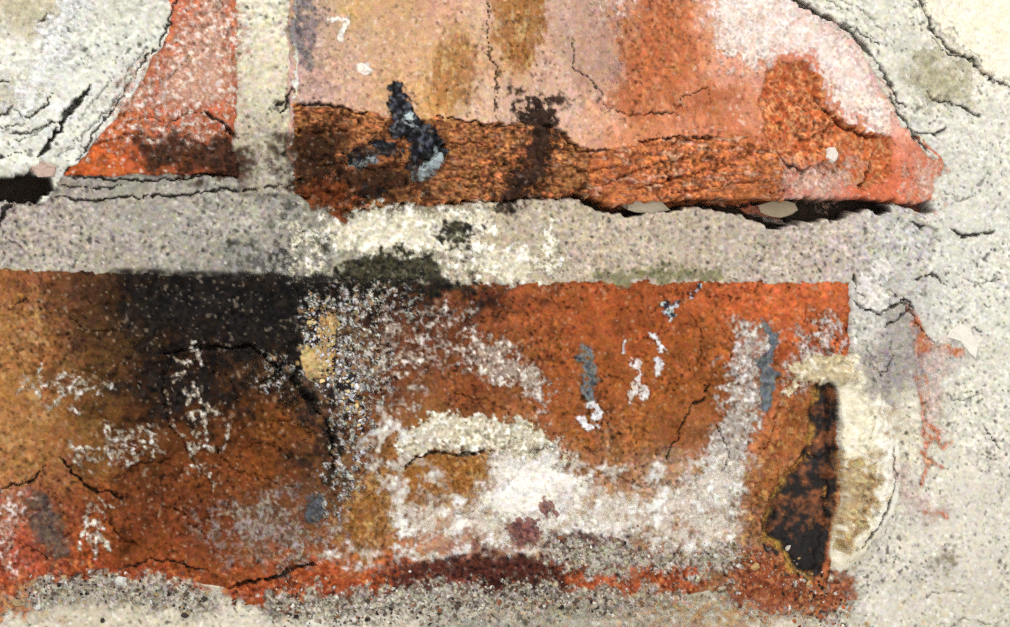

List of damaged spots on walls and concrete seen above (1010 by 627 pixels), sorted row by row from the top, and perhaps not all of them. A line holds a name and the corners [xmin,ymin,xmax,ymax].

damp [96,0,257,176]
spalling [289,59,893,214]
damp [775,157,864,207]
damp [903,159,950,215]
damp [0,85,779,577]
damp [781,305,964,435]
spalling [0,569,229,617]
spalling [255,537,853,627]
damp [927,544,960,575]